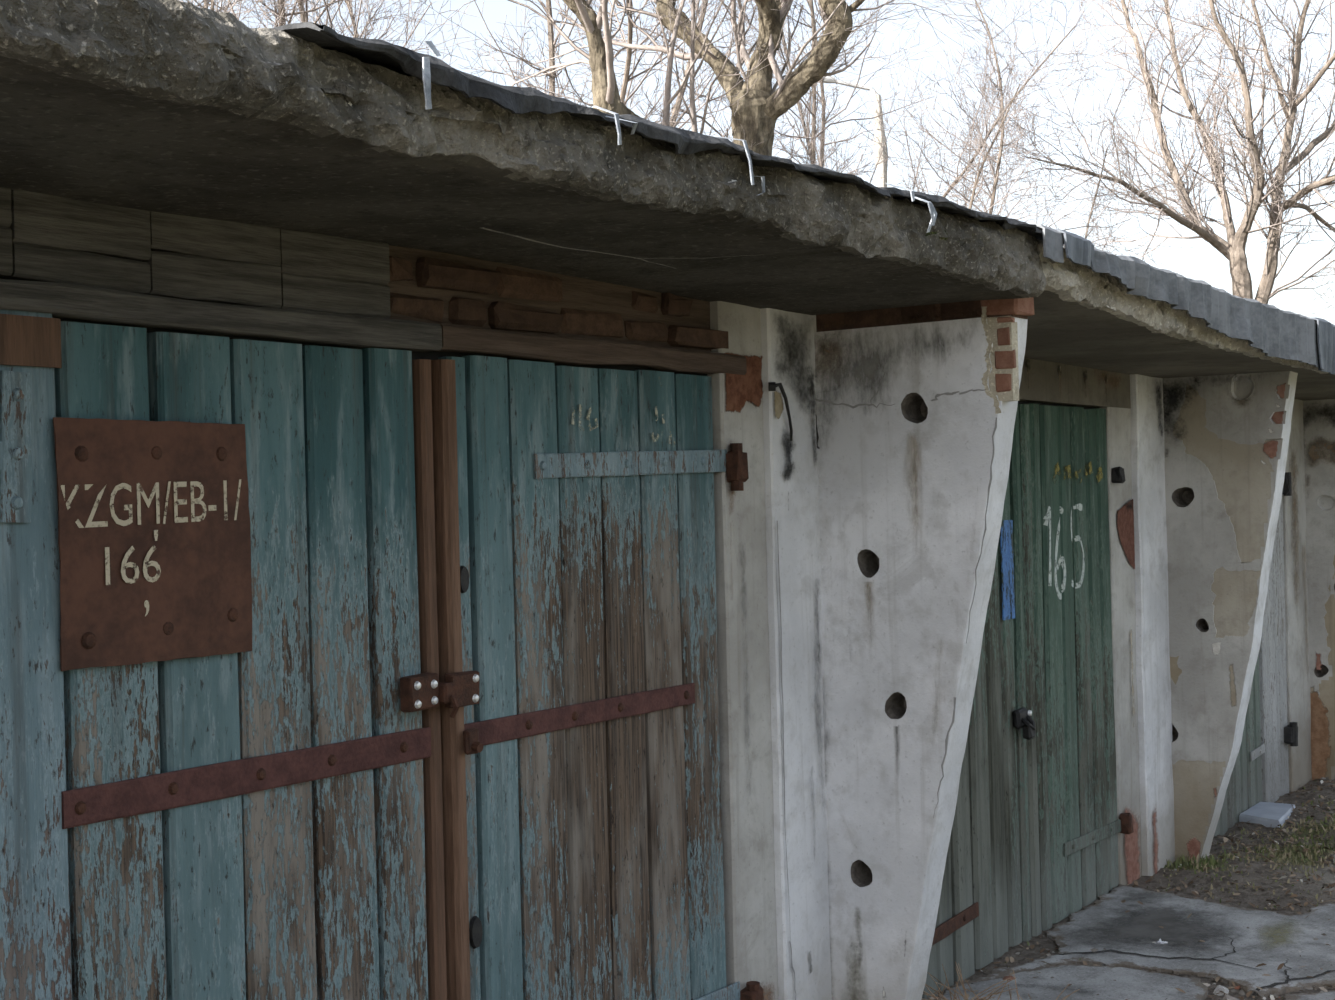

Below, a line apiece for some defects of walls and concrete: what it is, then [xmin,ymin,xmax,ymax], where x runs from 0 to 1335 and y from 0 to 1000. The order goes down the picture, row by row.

spalling [725,352,783,419]
water stain [783,433,793,480]
spalling [1117,499,1135,569]
peeling [1173,383,1286,655]
peeling [1170,656,1182,685]
peeling [1310,555,1335,780]
crack [1059,937,1335,996]